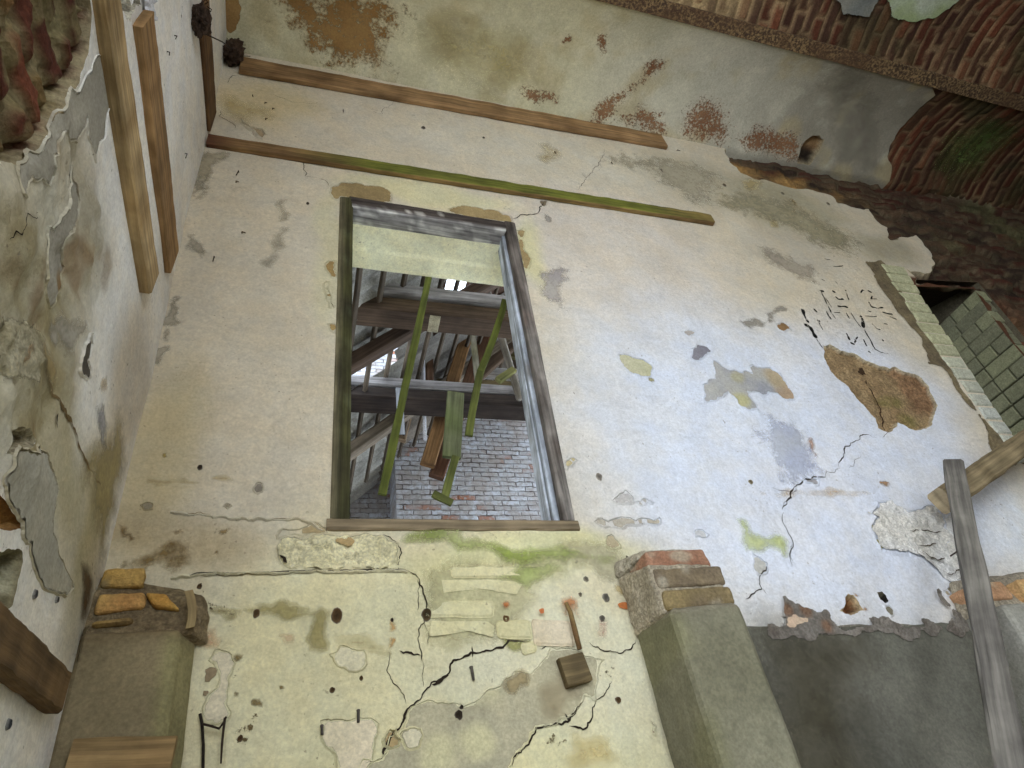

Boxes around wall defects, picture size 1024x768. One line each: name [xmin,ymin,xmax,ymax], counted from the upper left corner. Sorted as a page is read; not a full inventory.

flaking render [0,0,110,310]
flaking render [725,88,1024,346]
peeling [680,329,796,411]
flaking render [823,344,938,432]
flaking render [0,443,75,609]
crack [170,510,323,531]
water stain [569,545,627,609]
crack [747,432,888,599]
flaking render [768,500,970,641]
crack [171,535,546,762]
crack [590,642,636,654]
crack [509,683,611,767]